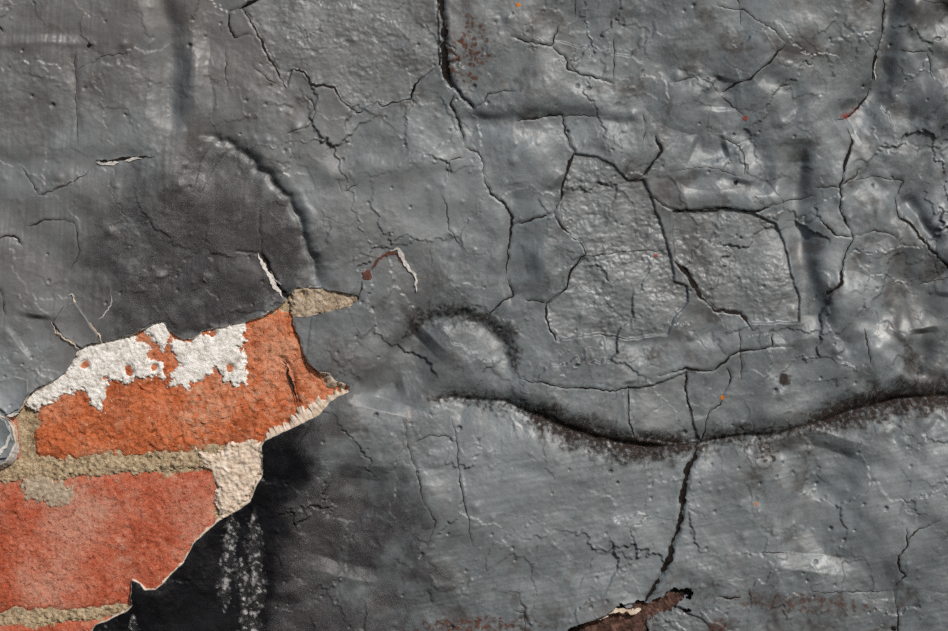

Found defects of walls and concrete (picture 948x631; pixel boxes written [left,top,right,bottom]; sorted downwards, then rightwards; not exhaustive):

crack [74,50,126,144]
crack [24,169,91,195]
crack [629,0,948,297]
crack [0,219,81,264]
crack [225,0,786,603]
peeling [0,247,418,631]
water stain [527,403,694,461]
water stain [806,376,948,430]
spalling [568,587,711,631]
crack [806,520,940,631]